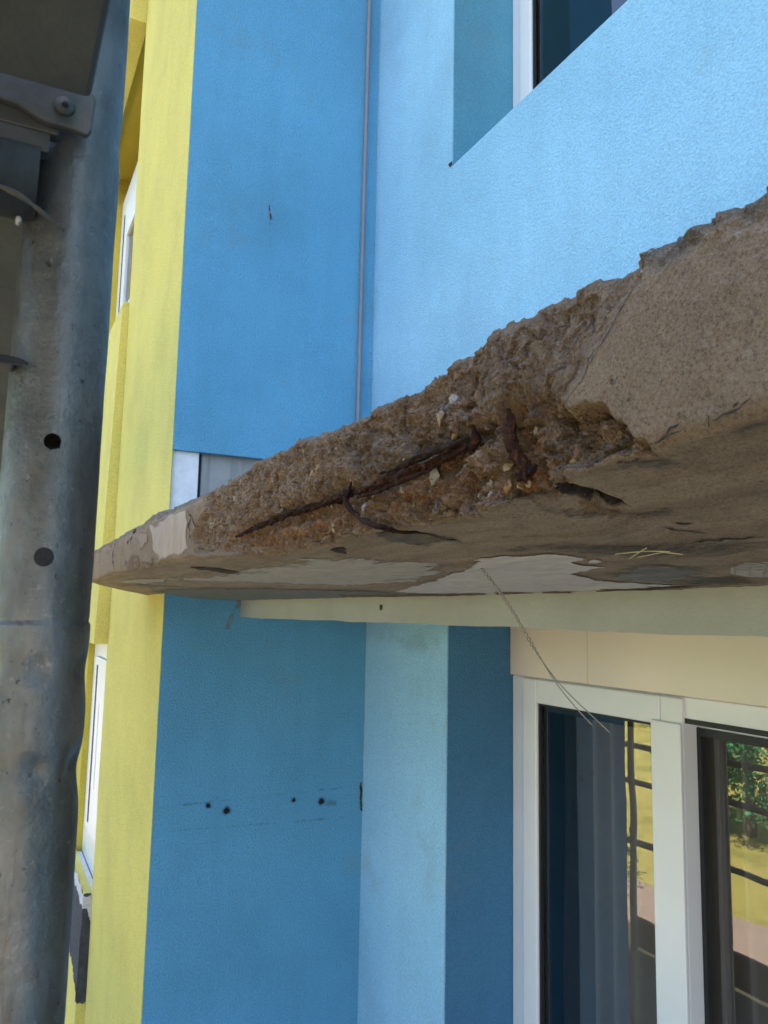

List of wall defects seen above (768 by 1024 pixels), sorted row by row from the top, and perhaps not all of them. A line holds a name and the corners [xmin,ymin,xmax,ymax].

spalling [114,248,706,598]